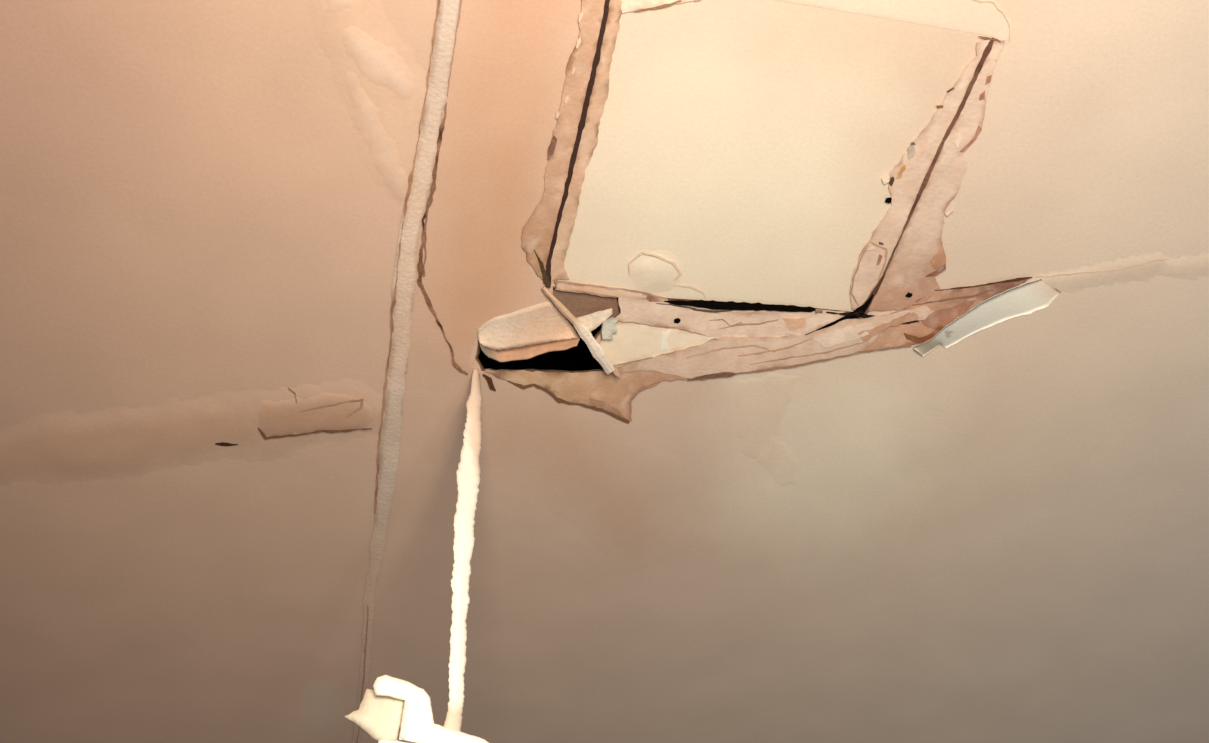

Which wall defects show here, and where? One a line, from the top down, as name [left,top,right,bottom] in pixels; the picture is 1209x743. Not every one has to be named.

peeling [955,126,982,152]
crack [417,102,496,391]
peeling [925,245,946,277]
flaking render [475,286,604,373]
peeling [783,309,823,330]
peeling [913,279,1061,357]